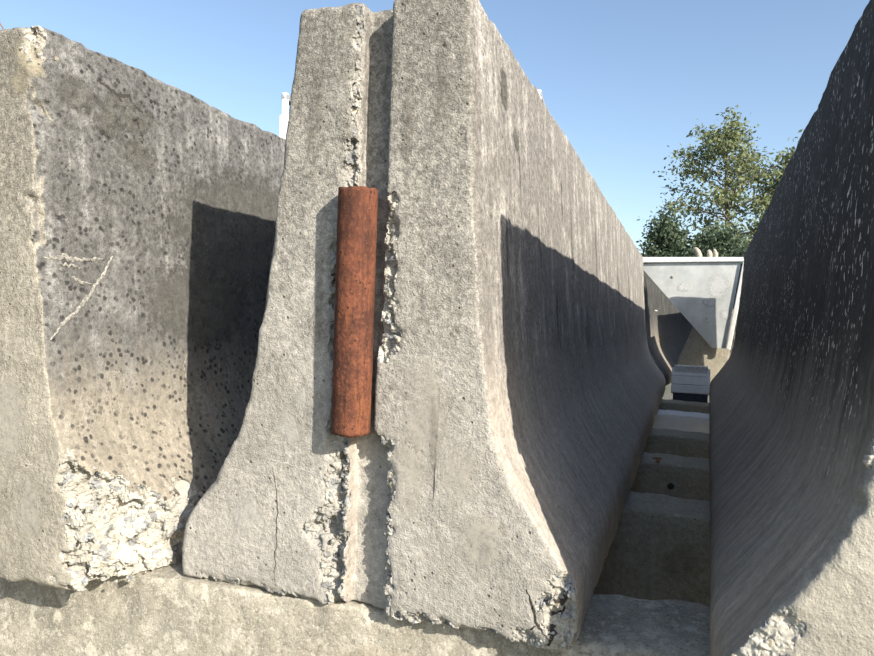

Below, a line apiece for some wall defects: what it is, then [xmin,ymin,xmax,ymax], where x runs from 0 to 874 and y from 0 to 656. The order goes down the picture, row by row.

spalling [340,4,366,187]
spalling [50,448,205,591]
spalling [303,235,351,605]
spalling [378,434,459,629]
spalling [471,569,580,651]
spalling [862,438,874,469]